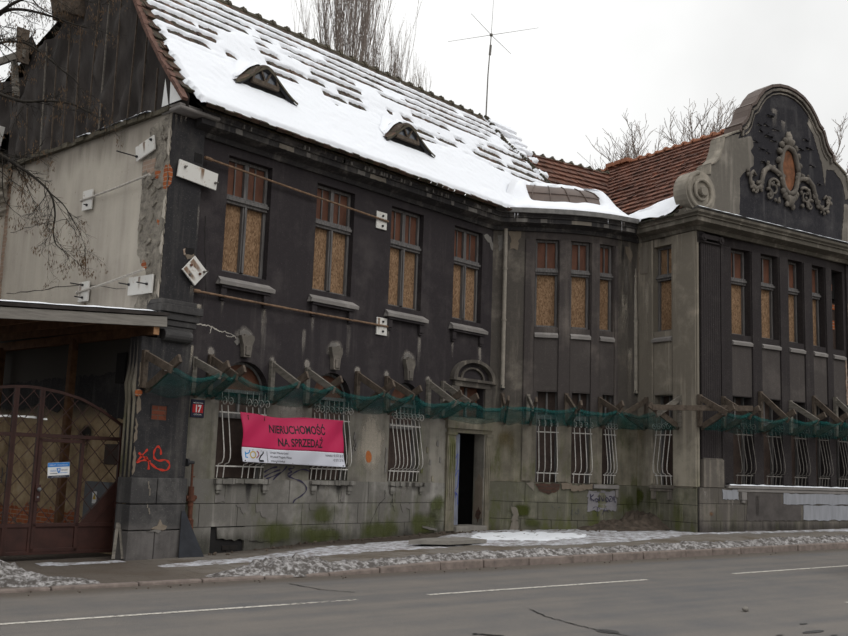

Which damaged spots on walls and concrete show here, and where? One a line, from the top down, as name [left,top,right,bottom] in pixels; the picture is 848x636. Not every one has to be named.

flaking render [134,112,173,309]
flaking render [807,119,848,242]